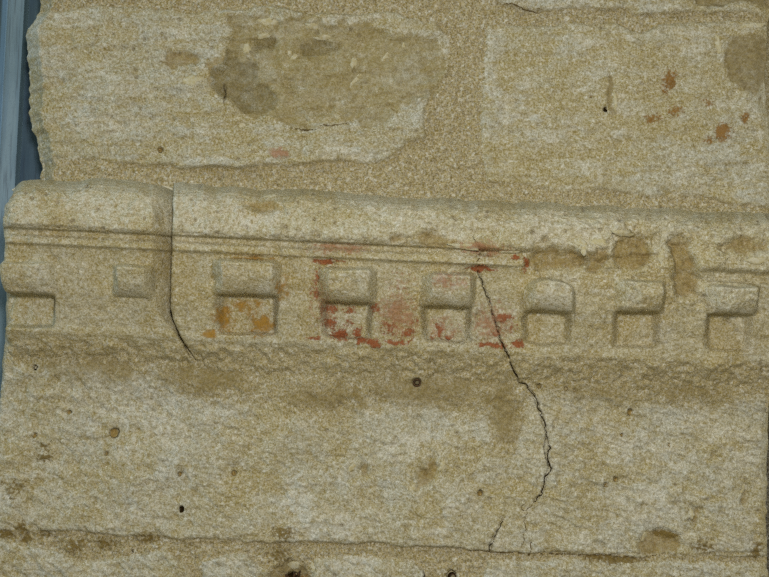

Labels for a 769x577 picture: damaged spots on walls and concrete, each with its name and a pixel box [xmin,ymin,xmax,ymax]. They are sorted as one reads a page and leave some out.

crack [473,238,663,559]